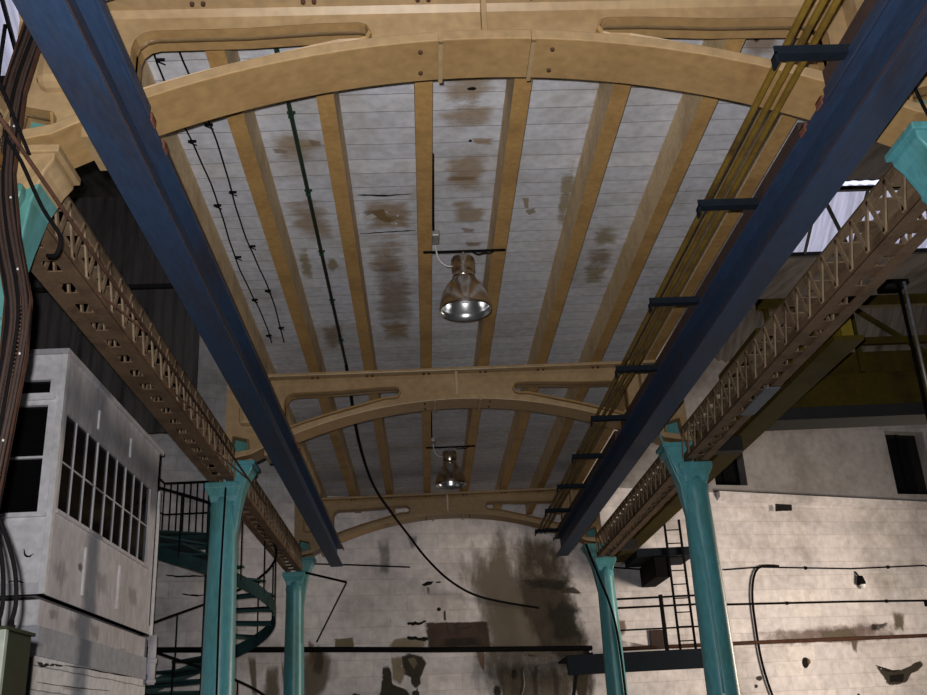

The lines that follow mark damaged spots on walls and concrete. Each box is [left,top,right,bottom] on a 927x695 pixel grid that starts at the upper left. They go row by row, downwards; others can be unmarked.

water stain [370,205,406,226]
flaking render [380,607,490,695]
water stain [471,540,593,695]
spalling [876,660,922,685]